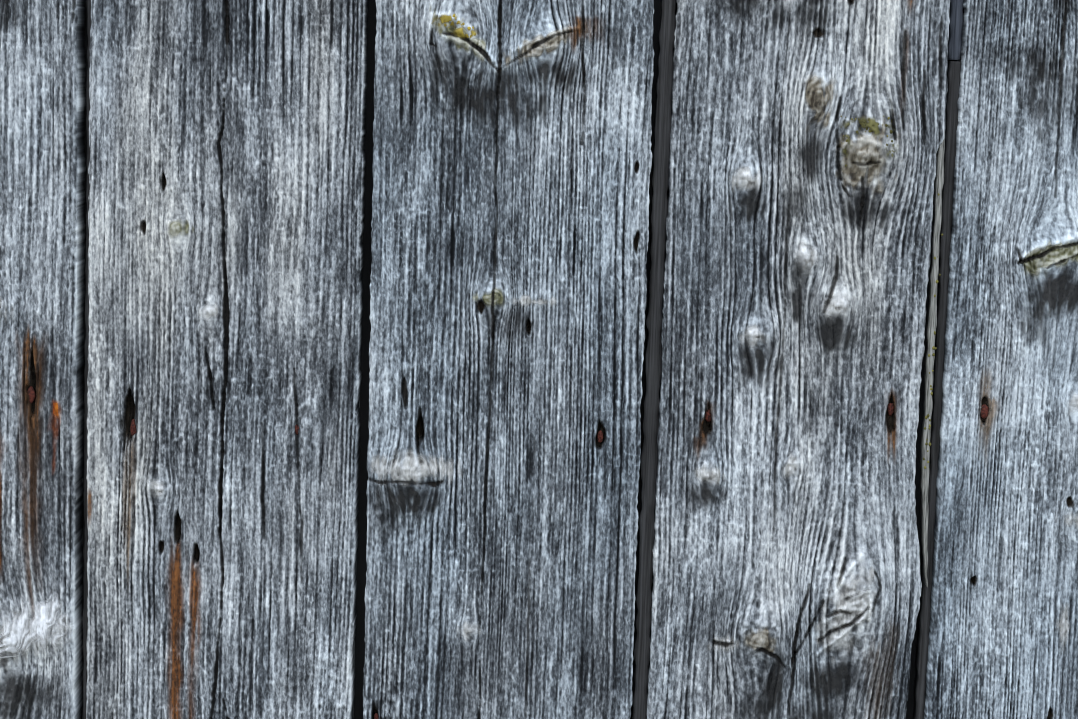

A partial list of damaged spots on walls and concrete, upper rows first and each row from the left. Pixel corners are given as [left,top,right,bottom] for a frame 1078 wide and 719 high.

rust [22,329,59,547]
rust [168,540,200,719]